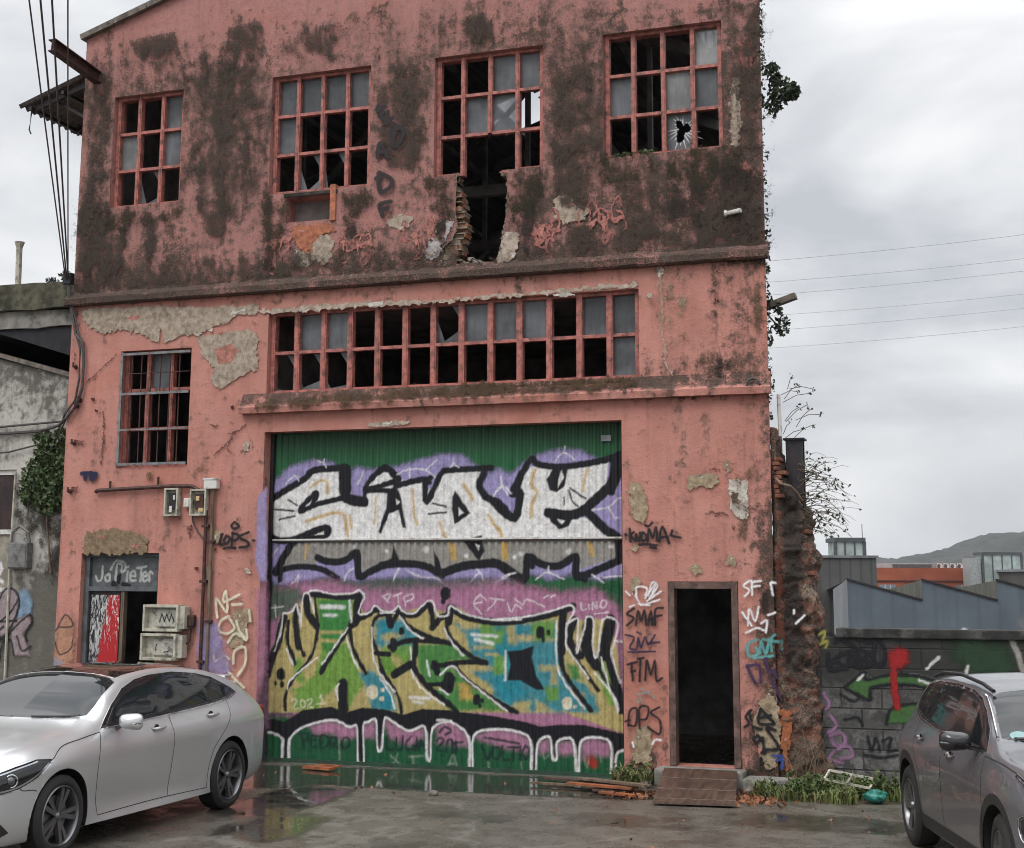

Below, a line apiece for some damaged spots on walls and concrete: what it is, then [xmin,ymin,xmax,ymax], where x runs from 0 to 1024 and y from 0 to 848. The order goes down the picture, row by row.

leakage [74,13,470,294]
leakage [368,6,513,170]
leakage [490,0,773,263]
peeling [291,222,337,268]
flaking render [425,173,472,266]
peeling [496,172,628,263]
leakage [728,259,766,268]
peeling [81,281,638,389]
peeling [82,528,148,556]
peeling [628,481,648,524]
spalling [686,460,749,519]
peeling [752,693,793,771]